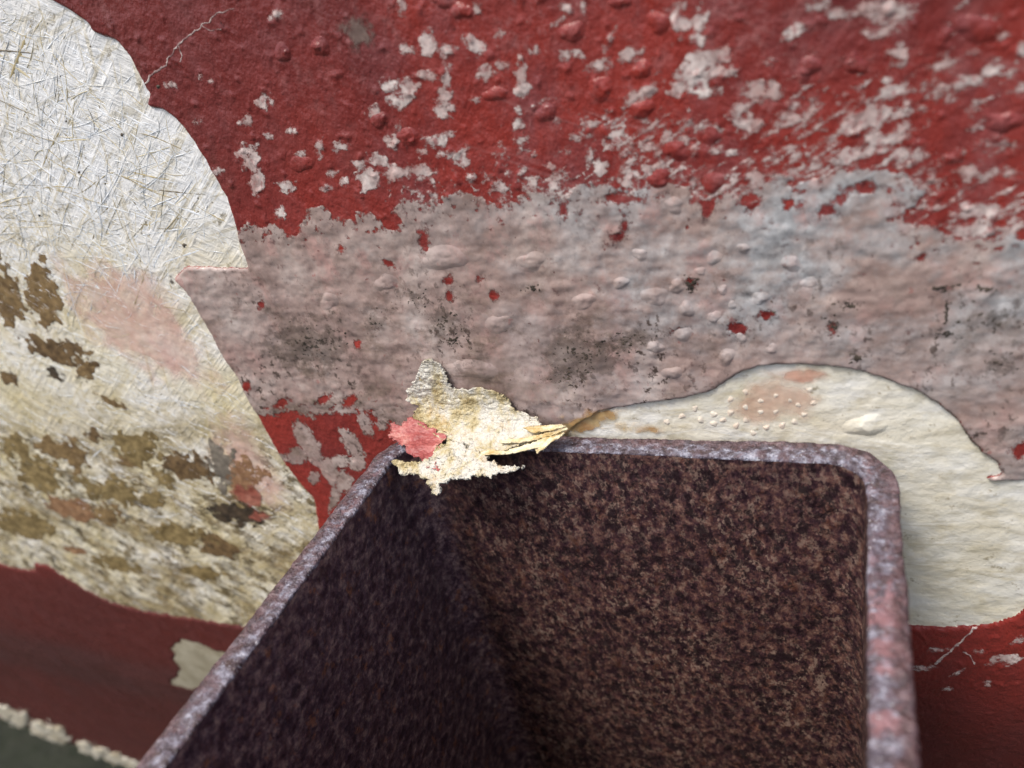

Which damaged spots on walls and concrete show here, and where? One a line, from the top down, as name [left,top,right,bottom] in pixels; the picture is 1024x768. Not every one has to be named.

crack [144,8,234,85]
peeling [369,31,455,120]
peeling [462,34,538,96]
peeling [560,34,645,70]
peeling [622,1,737,108]
peeling [807,0,913,68]
peeling [234,133,296,196]
peeling [320,131,470,194]
peeling [583,148,609,181]
peeling [727,79,825,147]
peeling [830,101,914,166]
peeling [171,639,224,690]